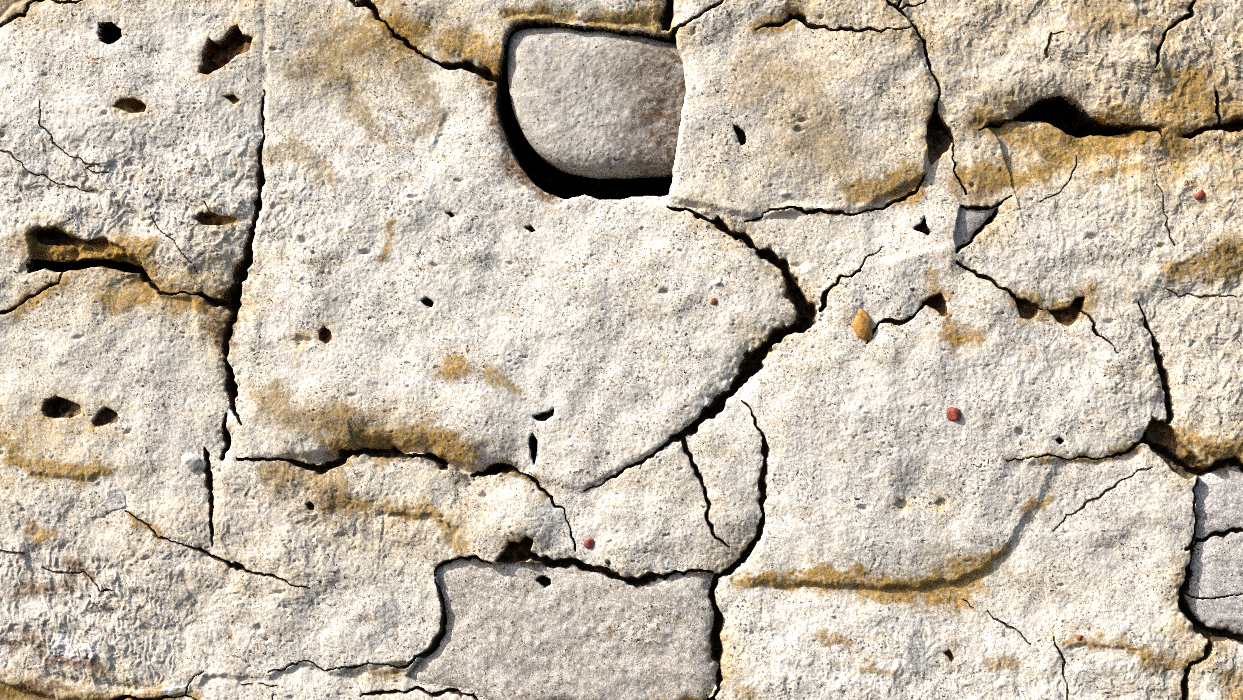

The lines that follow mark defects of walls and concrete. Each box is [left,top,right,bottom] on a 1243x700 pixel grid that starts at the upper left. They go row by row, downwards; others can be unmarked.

crack [0,0,82,28]
crack [1155,0,1197,68]
crack [0,100,109,192]
spalling [496,21,677,200]
crack [1114,91,1243,139]
crack [1156,184,1176,246]
crack [0,272,64,315]
crack [125,0,1118,700]
crack [1006,289,1243,700]
crack [0,549,113,592]
spalling [536,576,551,588]